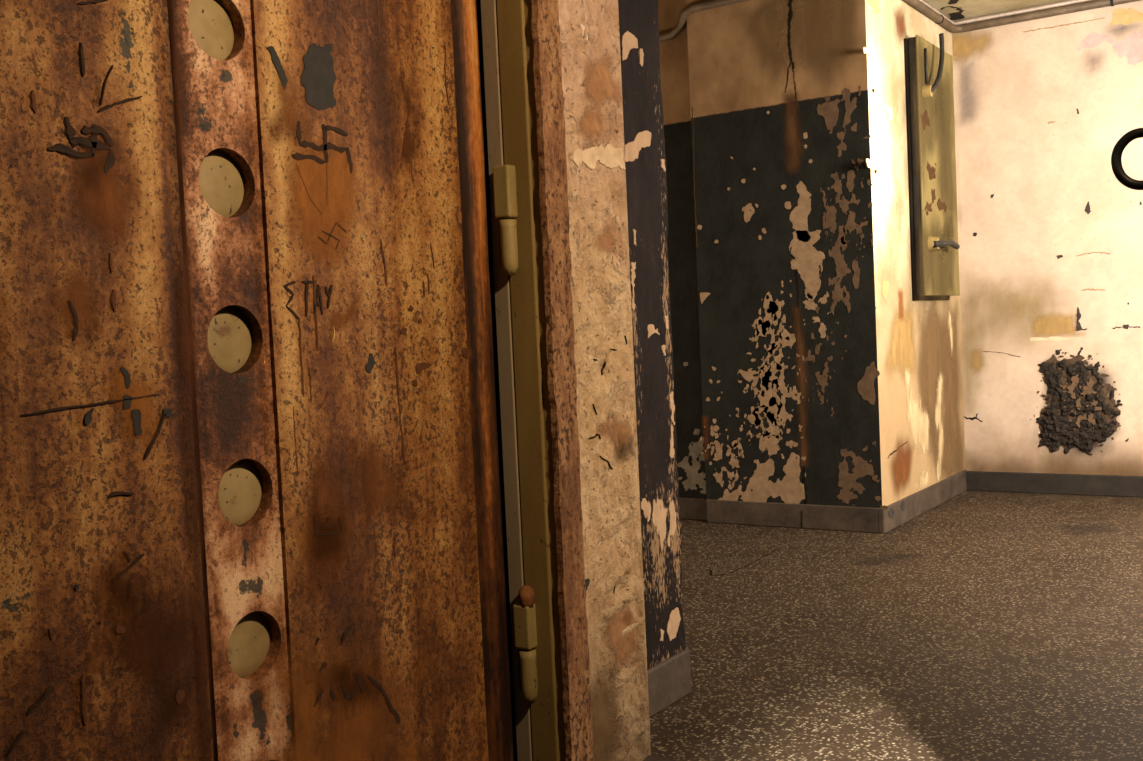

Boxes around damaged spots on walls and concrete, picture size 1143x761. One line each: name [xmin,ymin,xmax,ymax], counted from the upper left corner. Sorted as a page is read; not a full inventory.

crack [785,0,798,108]
rust [294,151,353,258]
rust [116,375,151,434]
rust [293,319,312,474]
peeling [647,316,669,356]
peeling [669,86,880,504]
crack [790,254,799,309]
spalling [1030,307,1129,455]
rust [179,204,214,761]
peeling [641,497,677,552]
crack [800,465,808,529]
peeling [660,607,681,642]